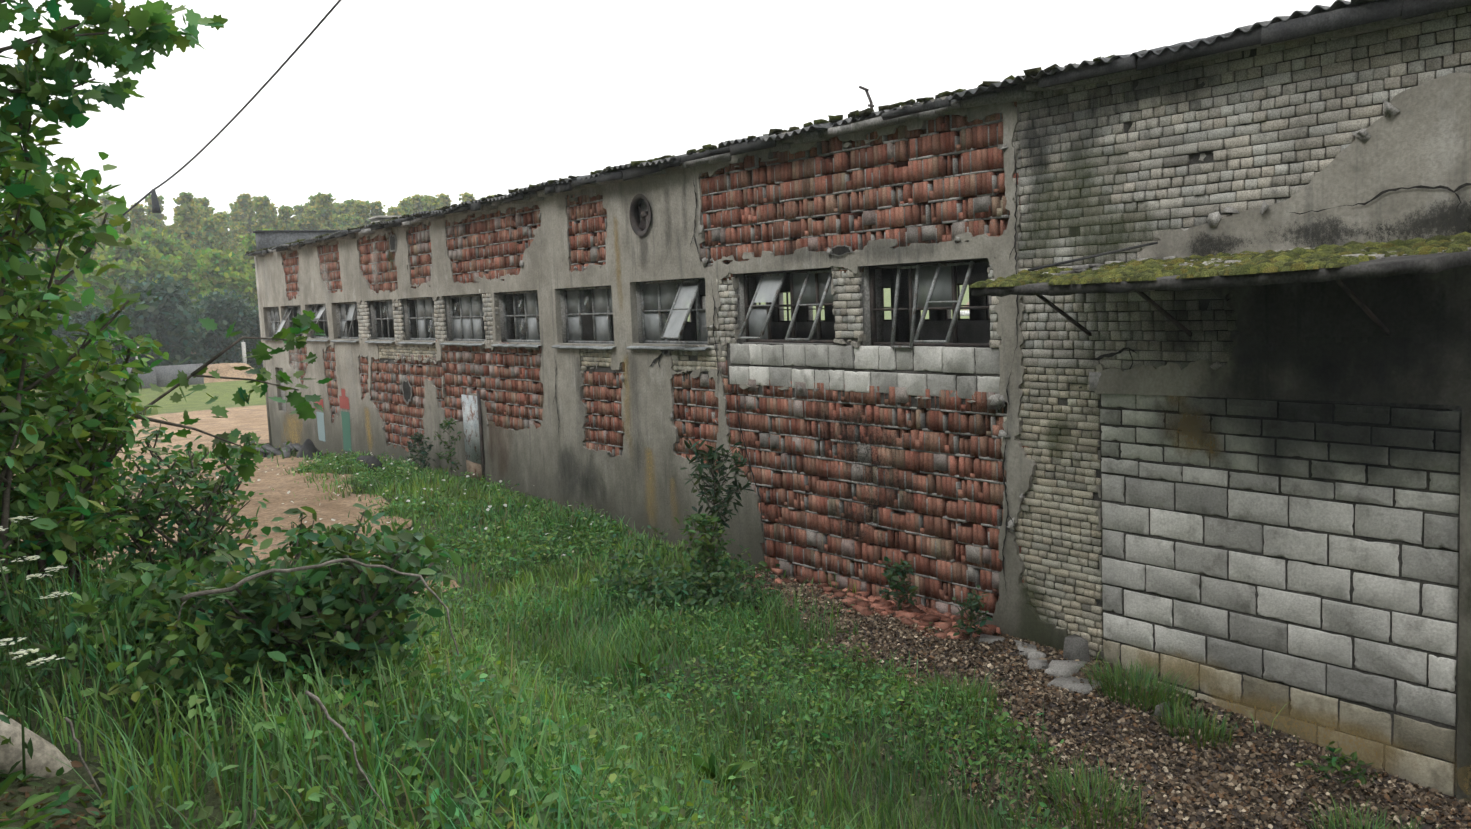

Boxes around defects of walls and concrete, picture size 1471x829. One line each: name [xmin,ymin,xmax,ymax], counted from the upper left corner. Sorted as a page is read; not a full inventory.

flaking render [282,250,299,300]
flaking render [567,192,607,272]
water stain [1189,232,1252,256]
water stain [1271,200,1471,247]
crack [1289,183,1471,215]
flaking render [317,205,544,453]
flaking render [659,6,1471,659]
flaking render [289,344,340,424]
flaking render [580,347,625,458]